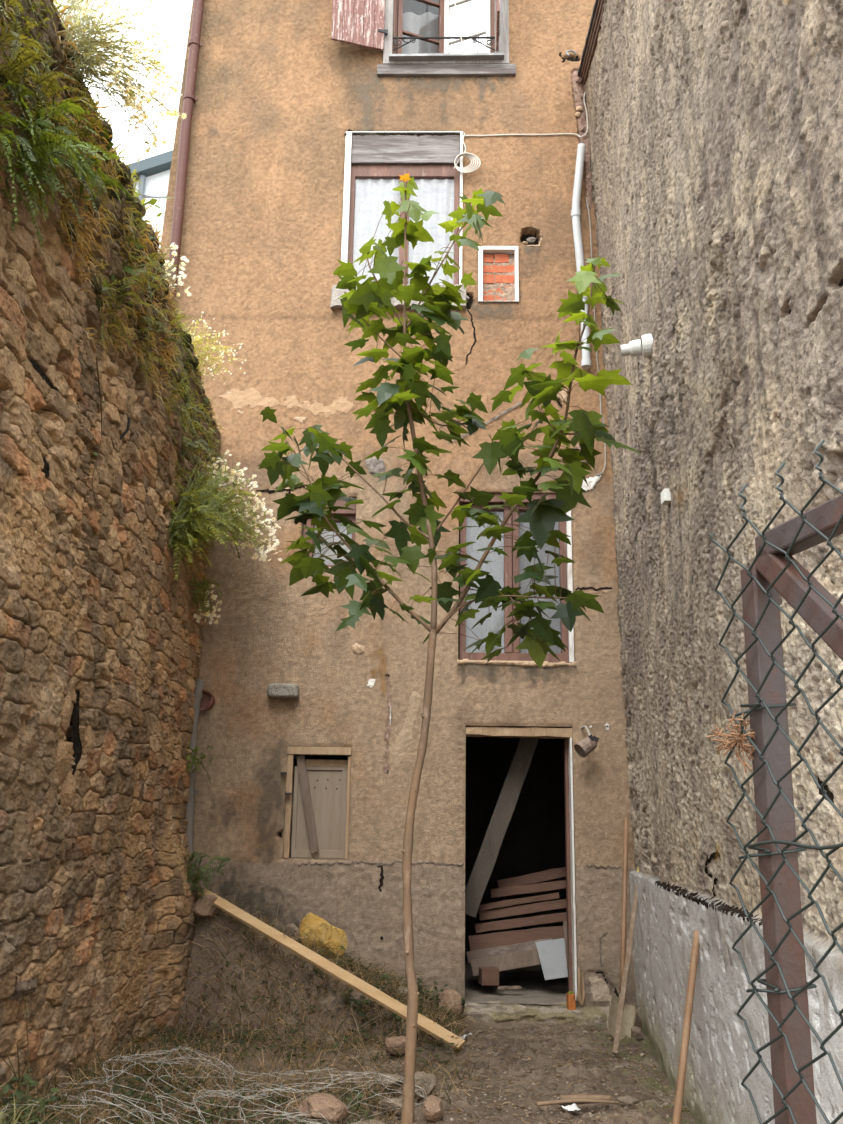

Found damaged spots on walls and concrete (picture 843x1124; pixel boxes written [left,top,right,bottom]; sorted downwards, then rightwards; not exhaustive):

crack [298,860,464,892]
crack [655,850,762,926]